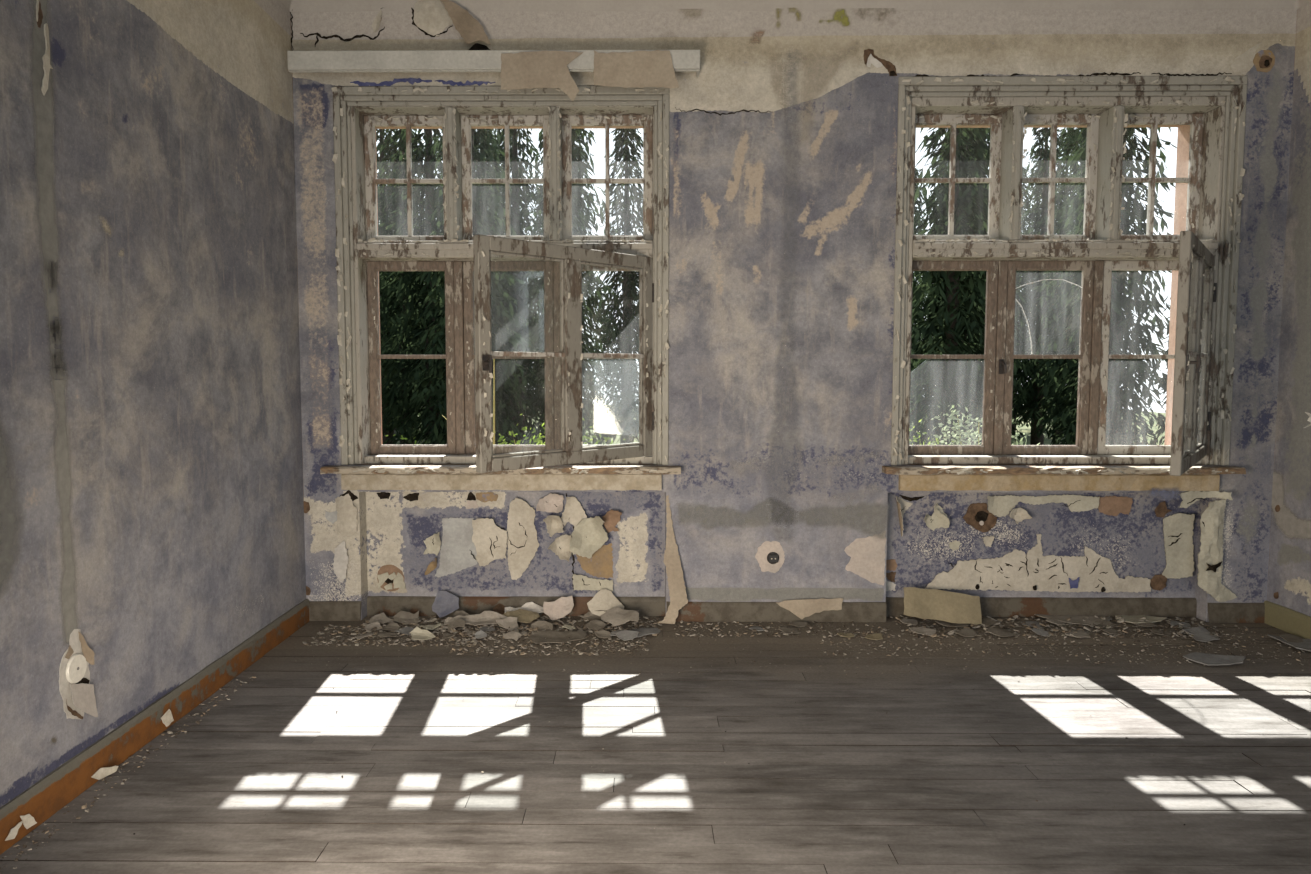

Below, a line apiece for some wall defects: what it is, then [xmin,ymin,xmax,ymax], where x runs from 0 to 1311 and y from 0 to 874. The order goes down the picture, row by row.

peeling [36,0,53,95]
crack [290,8,385,51]
crack [350,78,495,86]
spalling [864,49,963,151]
peeling [897,99,1245,257]
peeling [335,87,538,474]
spalling [325,490,358,583]
spalling [377,492,419,502]
peeling [423,492,498,577]
peeling [536,493,622,579]
peeling [899,494,1133,551]
spalling [1151,489,1237,602]